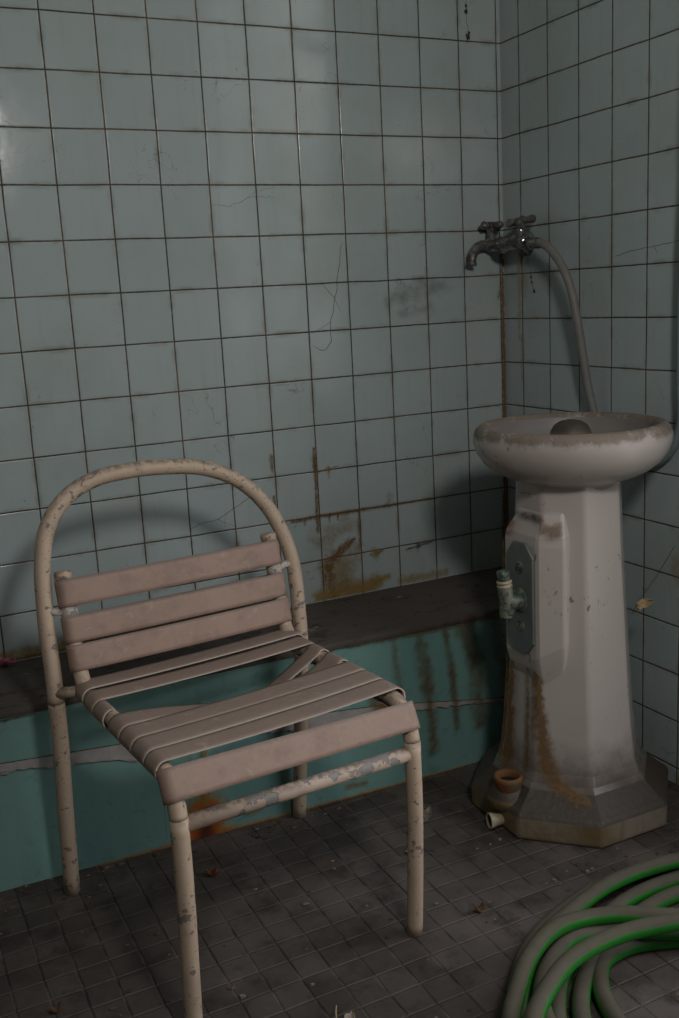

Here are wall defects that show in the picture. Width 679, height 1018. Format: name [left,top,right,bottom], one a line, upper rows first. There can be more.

corrosion [291,448,437,531]
peeling [308,705,387,729]
corrosion [498,657,589,806]
peeling [70,744,137,765]
corrosion [188,793,222,814]
corrosion [190,813,293,841]